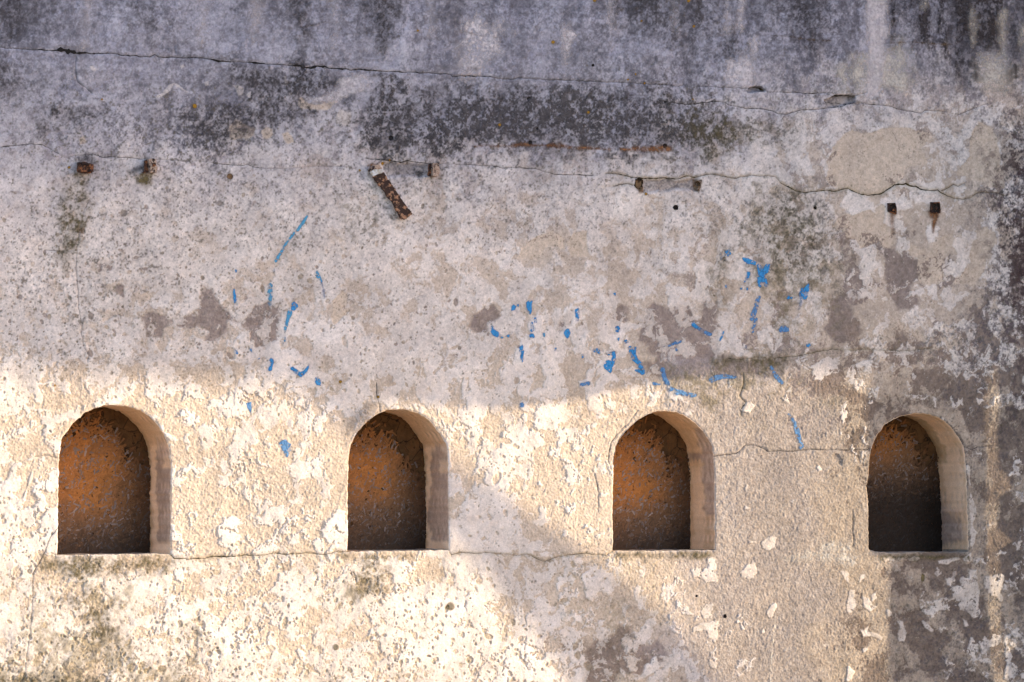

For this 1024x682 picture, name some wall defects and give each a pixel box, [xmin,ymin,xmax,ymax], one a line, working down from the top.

water stain [183,64,366,145]
crack [3,47,620,91]
water stain [364,0,400,51]
water stain [357,15,736,164]
water stain [628,0,659,29]
water stain [724,0,757,86]
water stain [838,0,908,96]
water stain [911,0,1017,92]
crack [457,164,1004,200]
flaking render [908,404,973,445]
flaking render [919,464,1005,633]